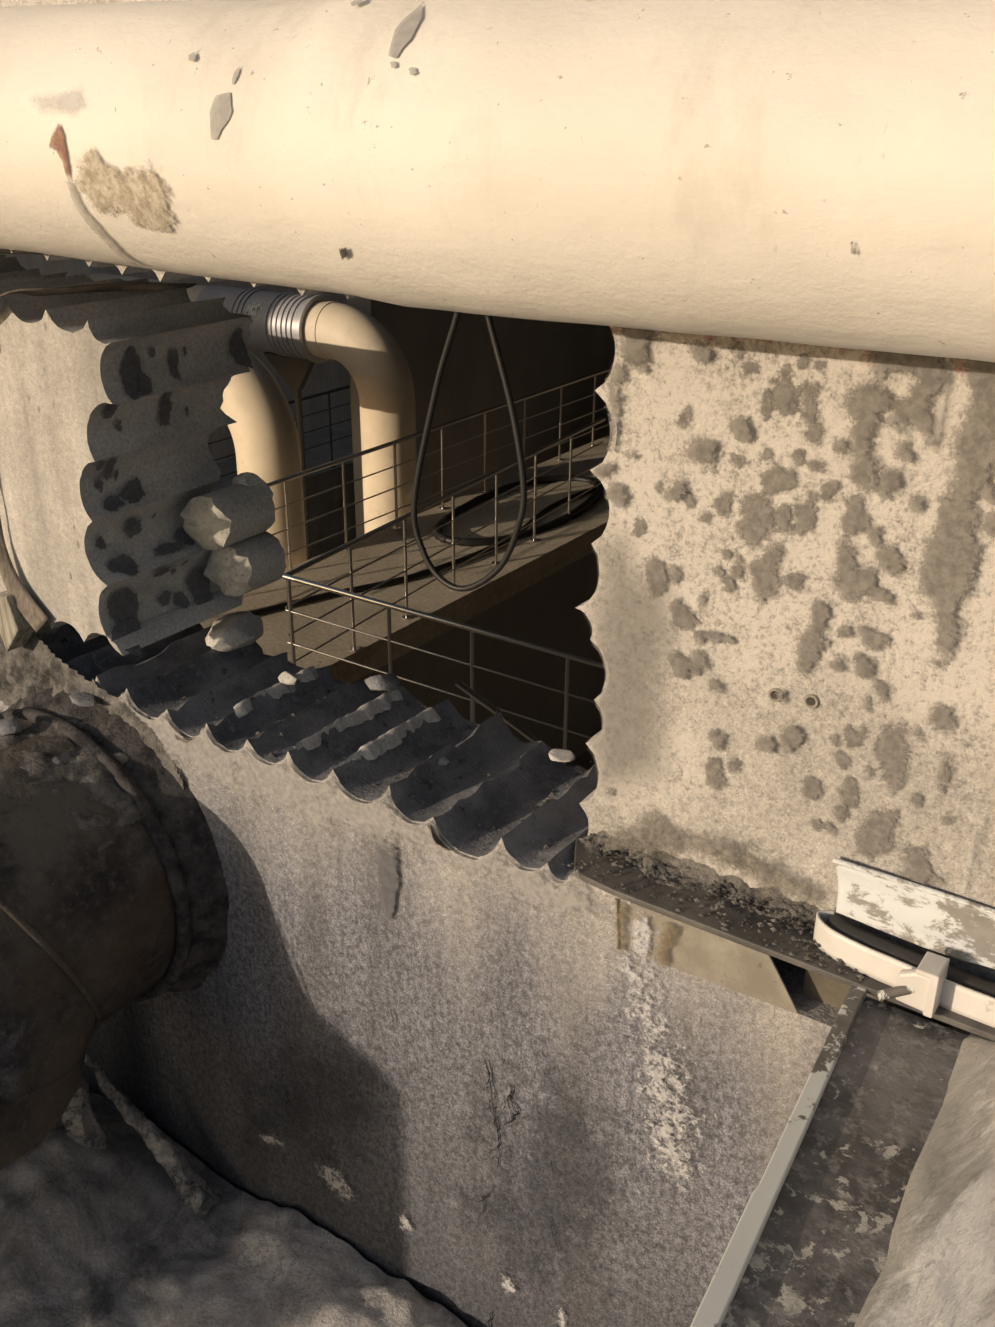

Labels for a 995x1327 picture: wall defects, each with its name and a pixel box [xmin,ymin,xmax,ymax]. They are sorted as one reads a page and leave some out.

peeling [389,4,422,75]
peeling [210,67,240,139]
peeling [75,148,176,233]
leakage [593,327,995,769]
spalling [232,665,318,718]
spalling [296,689,403,750]
leakage [118,694,602,921]
spalling [346,707,441,763]
leakage [705,728,741,790]
leakage [800,703,967,886]
leakage [619,902,716,1192]
crack [479,1055,519,1231]